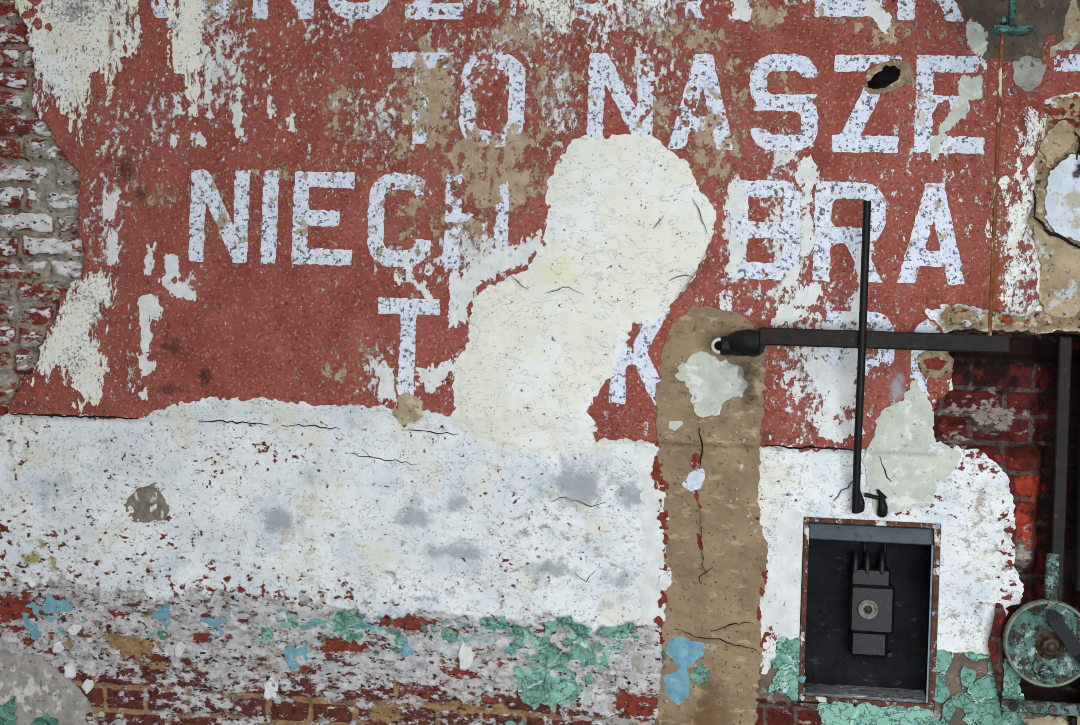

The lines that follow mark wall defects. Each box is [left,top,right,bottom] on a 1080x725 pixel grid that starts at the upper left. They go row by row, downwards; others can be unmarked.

peeling [166,0,216,149]
peeling [518,0,686,51]
peeling [914,73,983,162]
flaking render [0,0,143,416]
spalling [939,95,1080,332]
peeling [132,242,197,401]
peeling [394,229,543,331]
crack [201,420,340,429]
crack [352,449,412,465]
peeling [365,354,458,424]
flaking render [0,442,672,725]
peeling [926,650,1080,725]